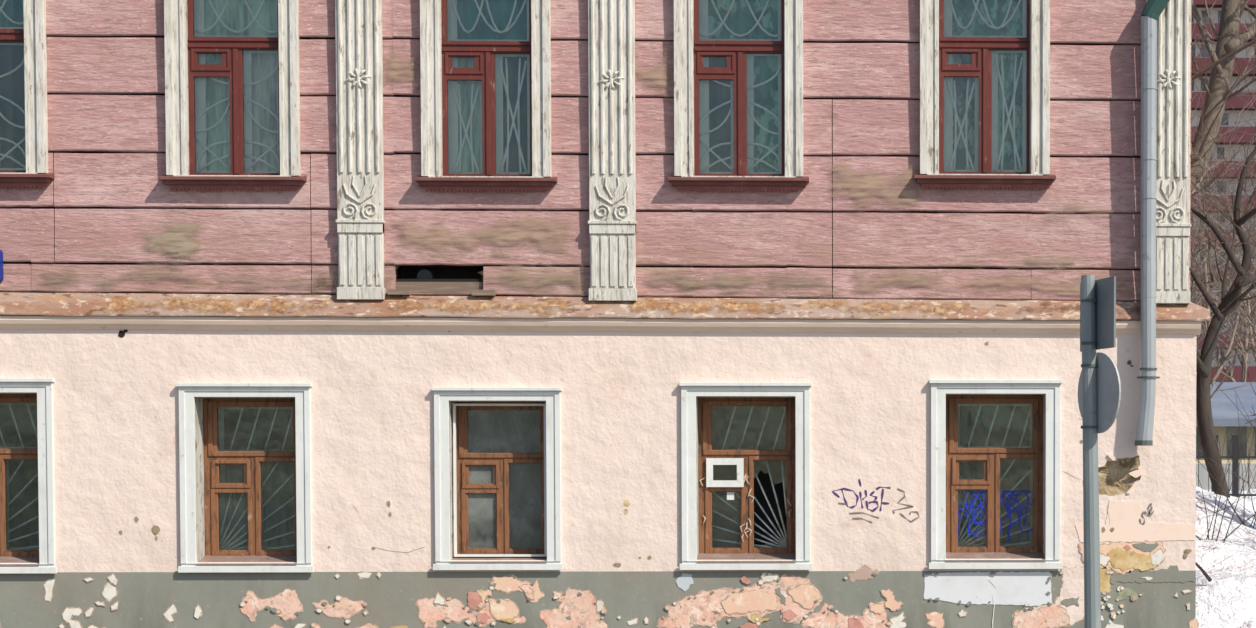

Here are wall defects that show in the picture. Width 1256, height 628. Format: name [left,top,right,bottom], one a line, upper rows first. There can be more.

spalling [1098,454,1142,496]
peeling [44,579,56,602]
peeling [59,574,119,628]
peeling [163,604,177,623]
peeling [240,565,906,628]
peeling [925,598,945,628]
peeling [1012,542,1084,628]
peeling [1100,527,1199,628]